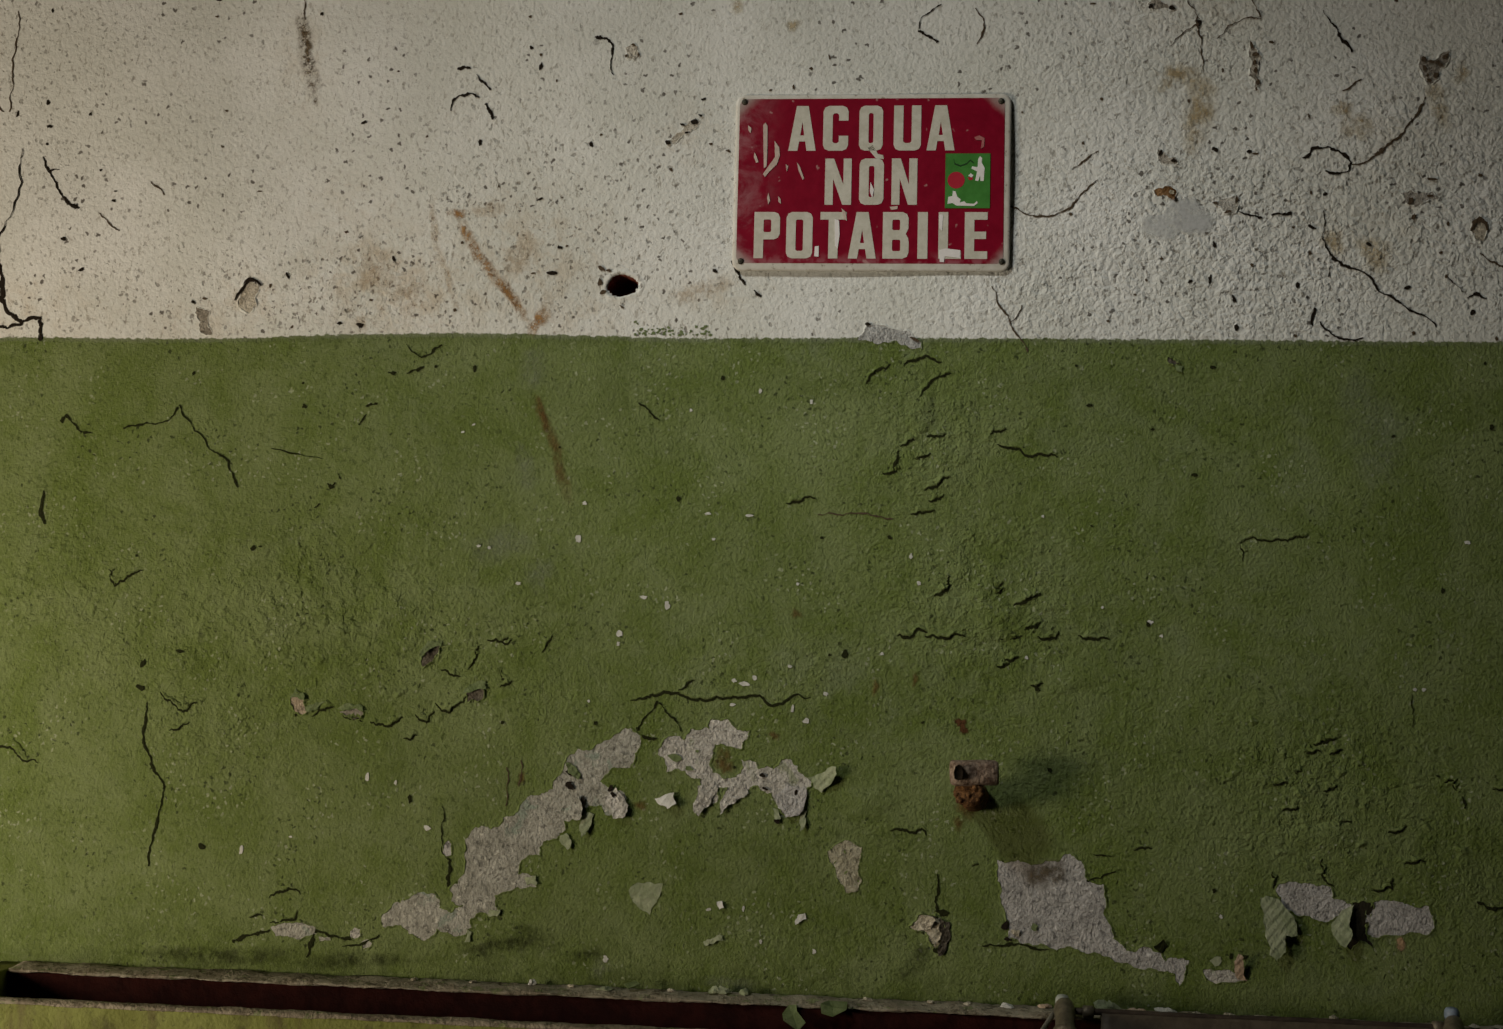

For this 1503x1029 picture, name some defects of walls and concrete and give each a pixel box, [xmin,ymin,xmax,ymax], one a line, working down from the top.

crack [1302,97,1426,175]
crack [0,148,119,341]
corrosion [454,209,545,331]
spalling [856,322,923,351]
crack [1238,210,1437,341]
crack [786,352,952,520]
crack [896,574,1110,688]
crack [630,676,811,741]
peeling [269,703,836,950]
peeling [826,838,863,895]
peeling [994,852,1250,988]
peeling [1260,879,1437,961]